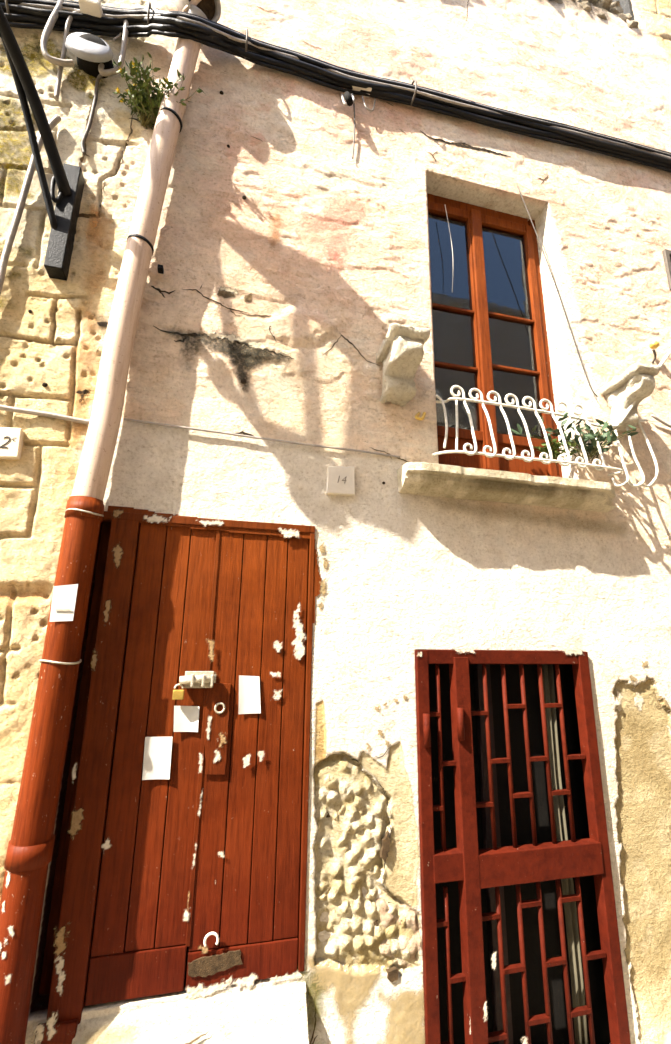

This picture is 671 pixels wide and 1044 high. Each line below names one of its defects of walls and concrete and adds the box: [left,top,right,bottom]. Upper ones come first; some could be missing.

crack [79,102,155,218]
crack [151,284,294,359]
crack [323,335,380,366]
peeling [359,730,422,983]
peeling [613,661,671,1044]